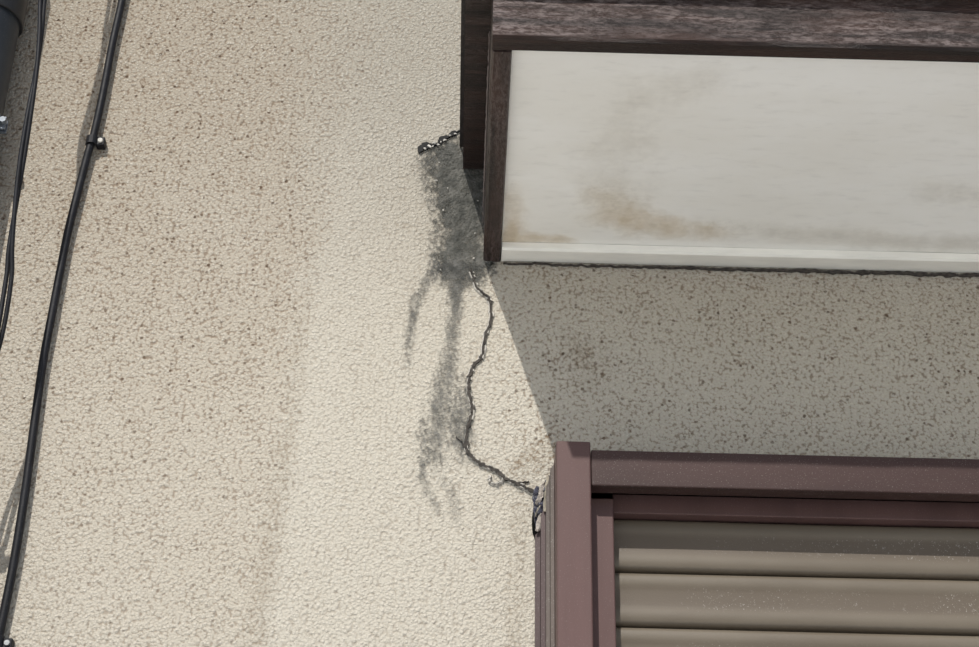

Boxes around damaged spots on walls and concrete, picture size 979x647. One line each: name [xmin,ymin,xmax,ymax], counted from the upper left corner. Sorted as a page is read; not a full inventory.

damp [406,136,495,477]
crack [456,269,534,496]